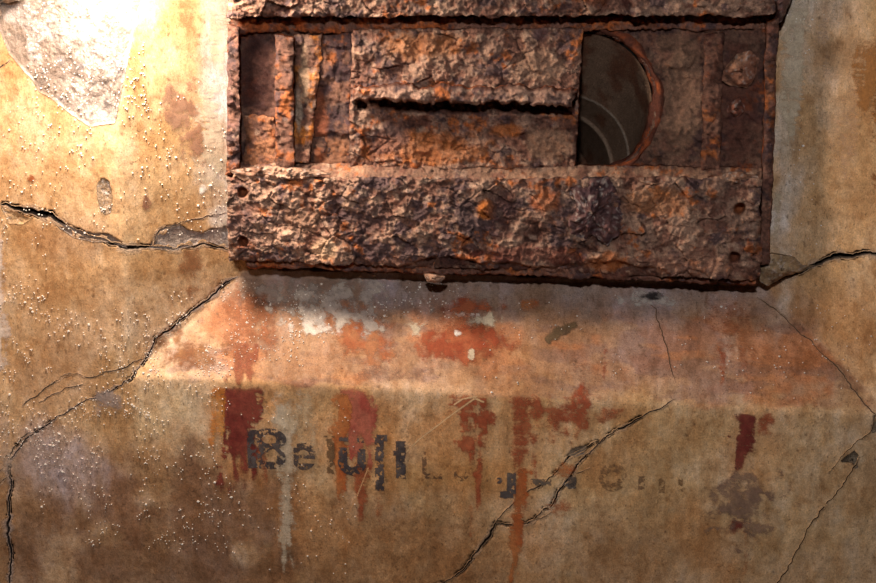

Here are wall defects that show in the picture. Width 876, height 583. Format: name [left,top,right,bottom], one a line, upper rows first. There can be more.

spalling [0,0,143,127]
peeling [160,77,203,156]
leakage [852,43,876,122]
corrosion [229,165,330,181]
crack [0,202,229,256]
corrosion [423,273,445,283]
crack [0,276,239,583]
corrosion [158,330,214,368]
corrosion [208,285,276,491]
corrosion [336,298,514,380]
crack [437,304,677,583]
crack [756,248,876,583]